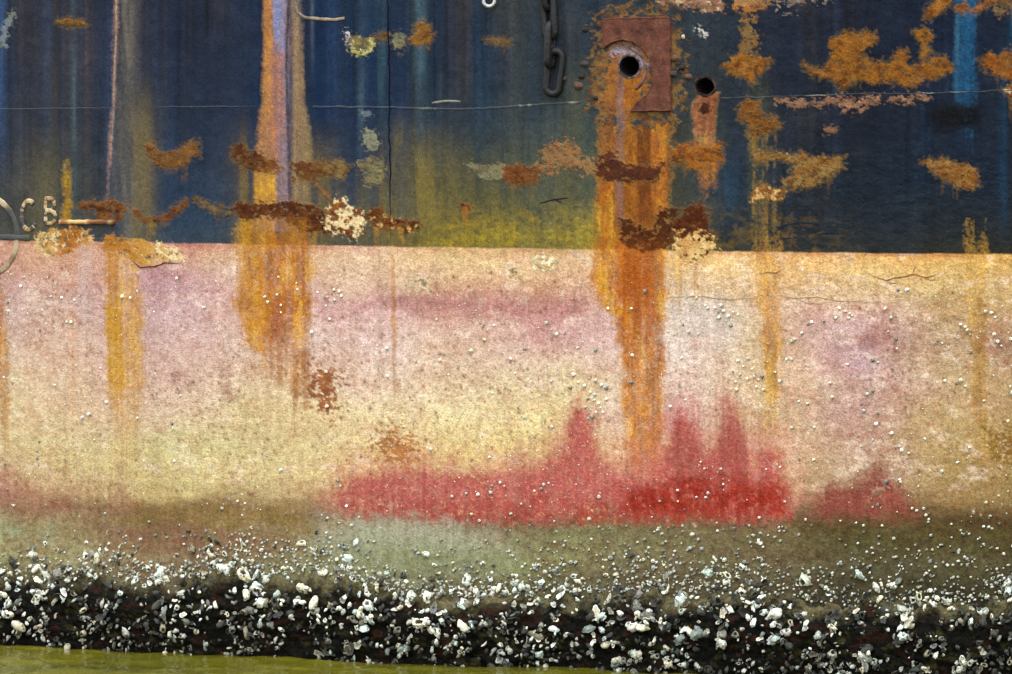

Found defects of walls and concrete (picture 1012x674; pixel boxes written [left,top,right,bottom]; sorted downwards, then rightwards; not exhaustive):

corrosion [52,11,93,32]
corrosion [797,0,1012,101]
corrosion [973,42,1012,123]
corrosion [916,153,985,200]
peeling [29,224,190,271]
corrosion [59,0,358,485]
peeling [316,192,370,245]
corrosion [578,0,729,448]
corrosion [718,47,849,429]